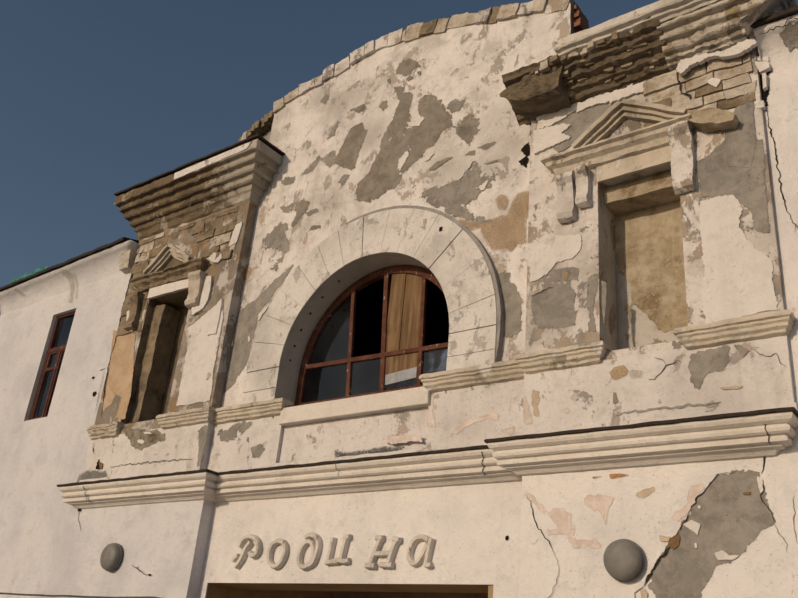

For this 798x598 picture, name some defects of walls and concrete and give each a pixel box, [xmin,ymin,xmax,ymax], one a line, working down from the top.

peeling [779,21,798,51]
spalling [281,122,368,186]
spalling [354,58,497,224]
flaking render [532,38,770,233]
crack [767,111,798,232]
spalling [102,206,243,451]
spalling [498,267,607,338]
spalling [688,345,749,389]
spalling [217,420,265,458]
crack [527,497,559,598]
peeling [525,493,601,549]
spalling [640,469,776,598]